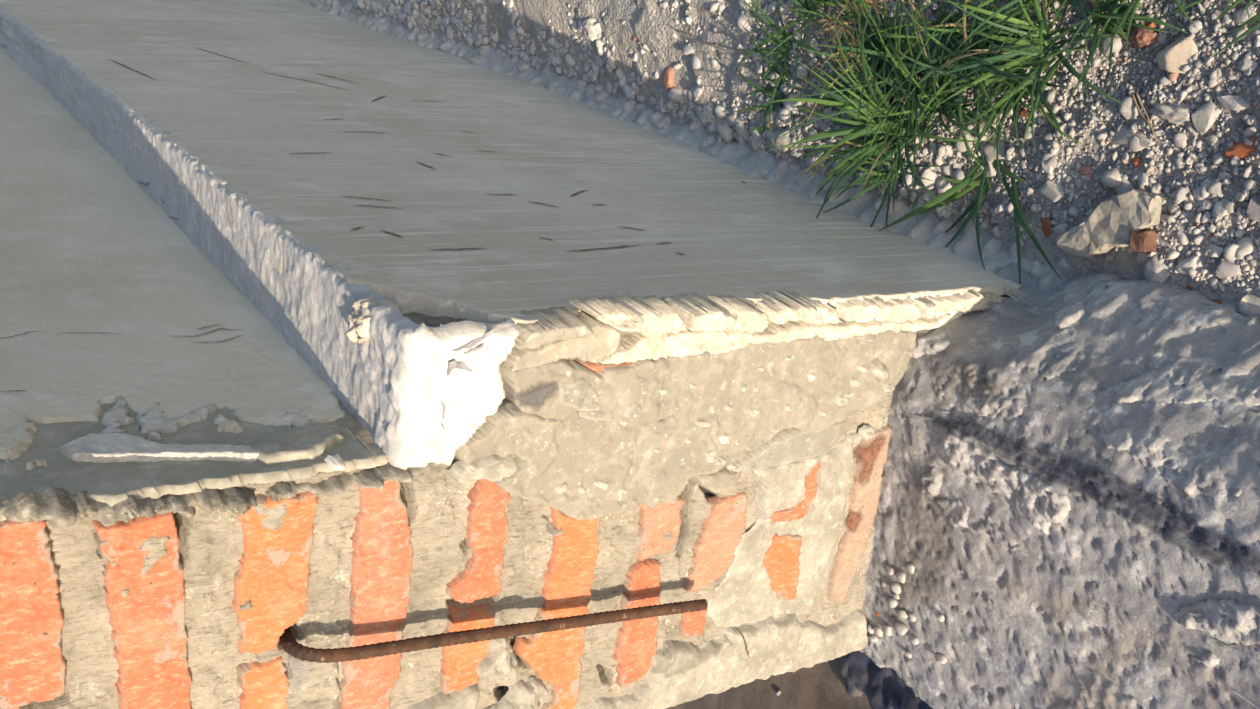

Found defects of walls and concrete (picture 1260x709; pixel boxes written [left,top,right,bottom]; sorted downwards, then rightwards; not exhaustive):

peeling [446,455,517,484]
water stain [932,418,1260,573]